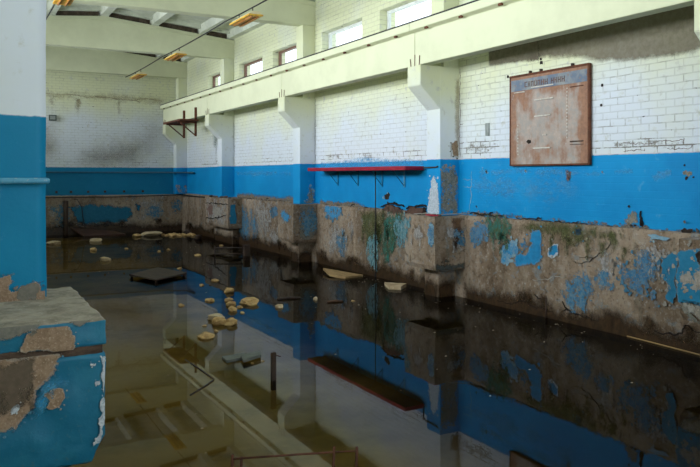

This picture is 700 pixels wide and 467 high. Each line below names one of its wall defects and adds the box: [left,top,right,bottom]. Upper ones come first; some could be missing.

damp [489,5,700,65]
peeling [608,138,694,149]
peeling [49,200,183,226]
flaking render [213,141,565,271]
flaking render [573,205,658,242]
flaking render [0,273,22,302]
damp [465,287,700,363]
peeling [560,220,700,324]
peeling [0,320,89,439]
spalling [90,355,106,447]